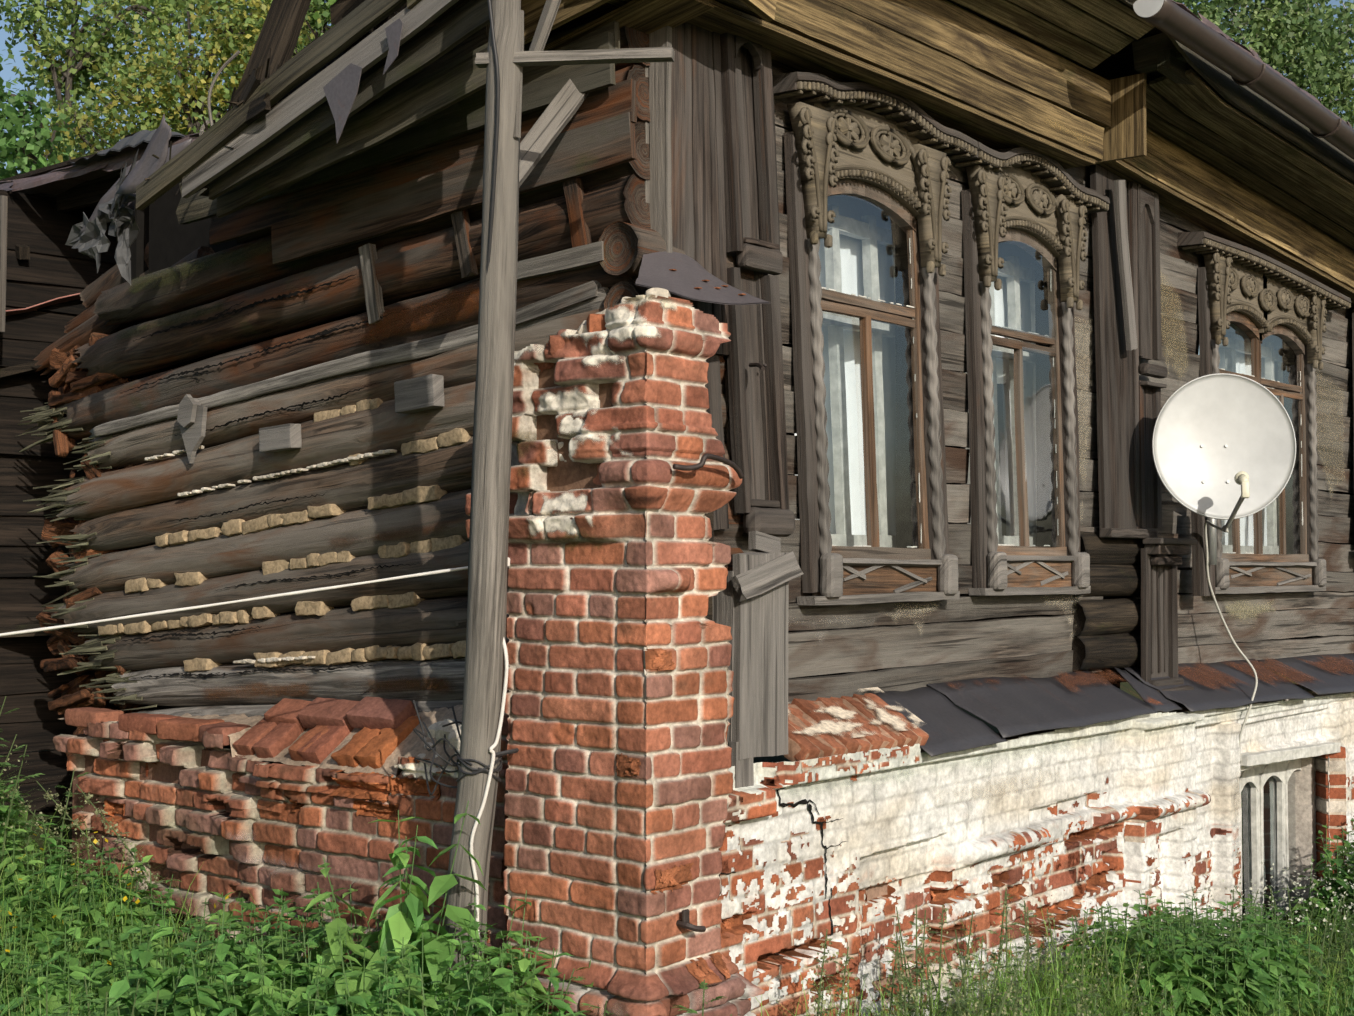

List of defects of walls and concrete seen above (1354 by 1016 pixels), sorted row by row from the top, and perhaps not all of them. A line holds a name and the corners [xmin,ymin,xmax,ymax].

corrosion [1178,657,1354,688]
crack [776,788,846,936]
peeling [686,746,1211,1016]
peeling [1182,828,1242,911]